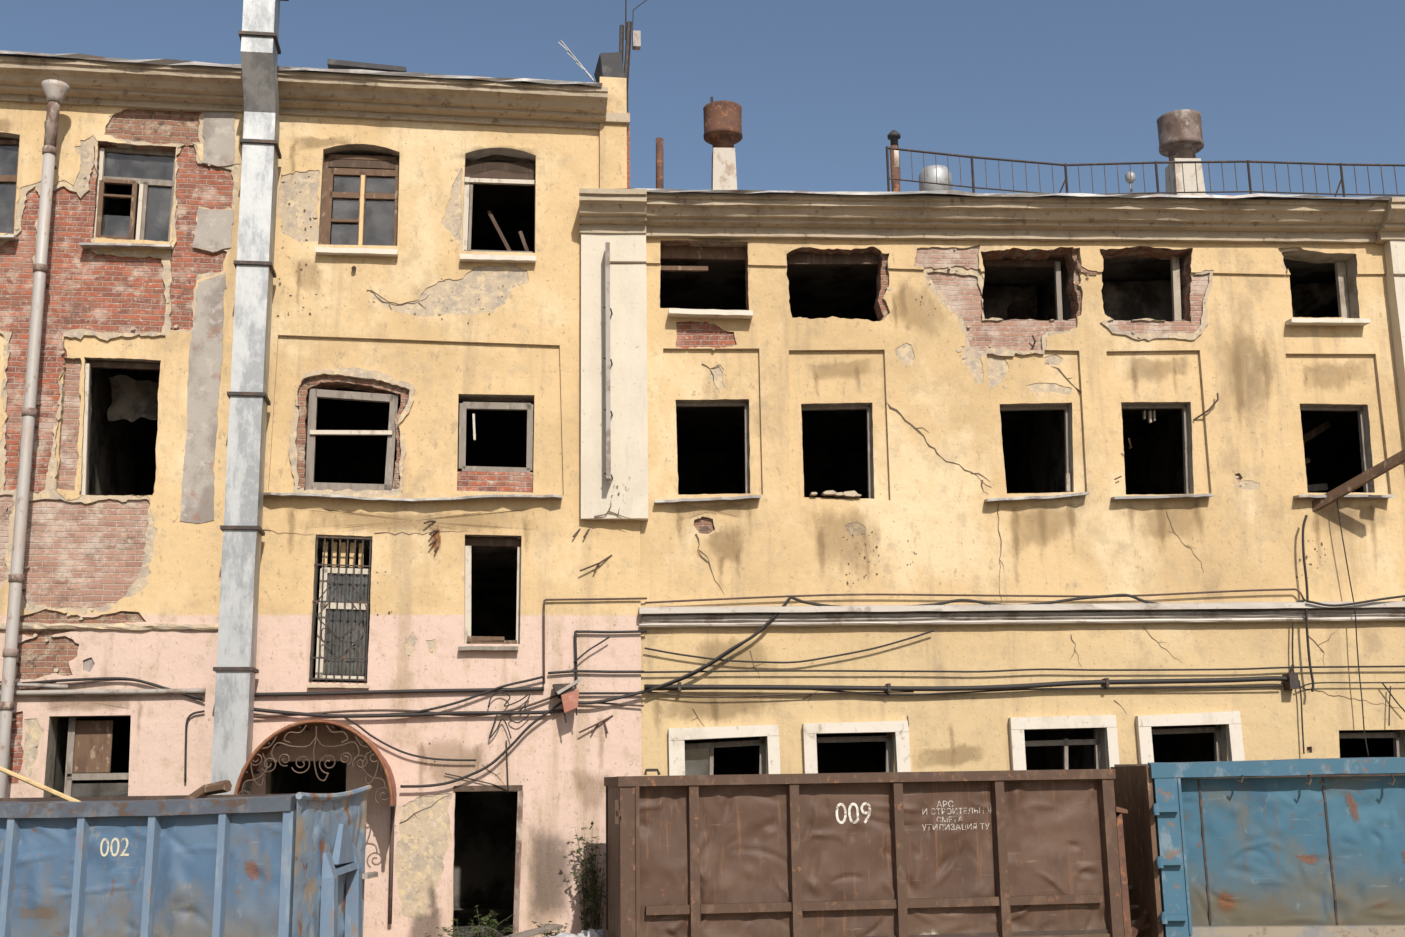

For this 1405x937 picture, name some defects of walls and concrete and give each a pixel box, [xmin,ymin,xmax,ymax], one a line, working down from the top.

flaking render [370,264,529,325]
flaking render [914,246,1097,389]
flaking render [1101,270,1213,340]
flaking render [0,108,241,690]
flaking render [676,320,737,390]
flaking render [1026,383,1072,396]
crack [885,403,1004,601]
flaking render [8,711,44,784]